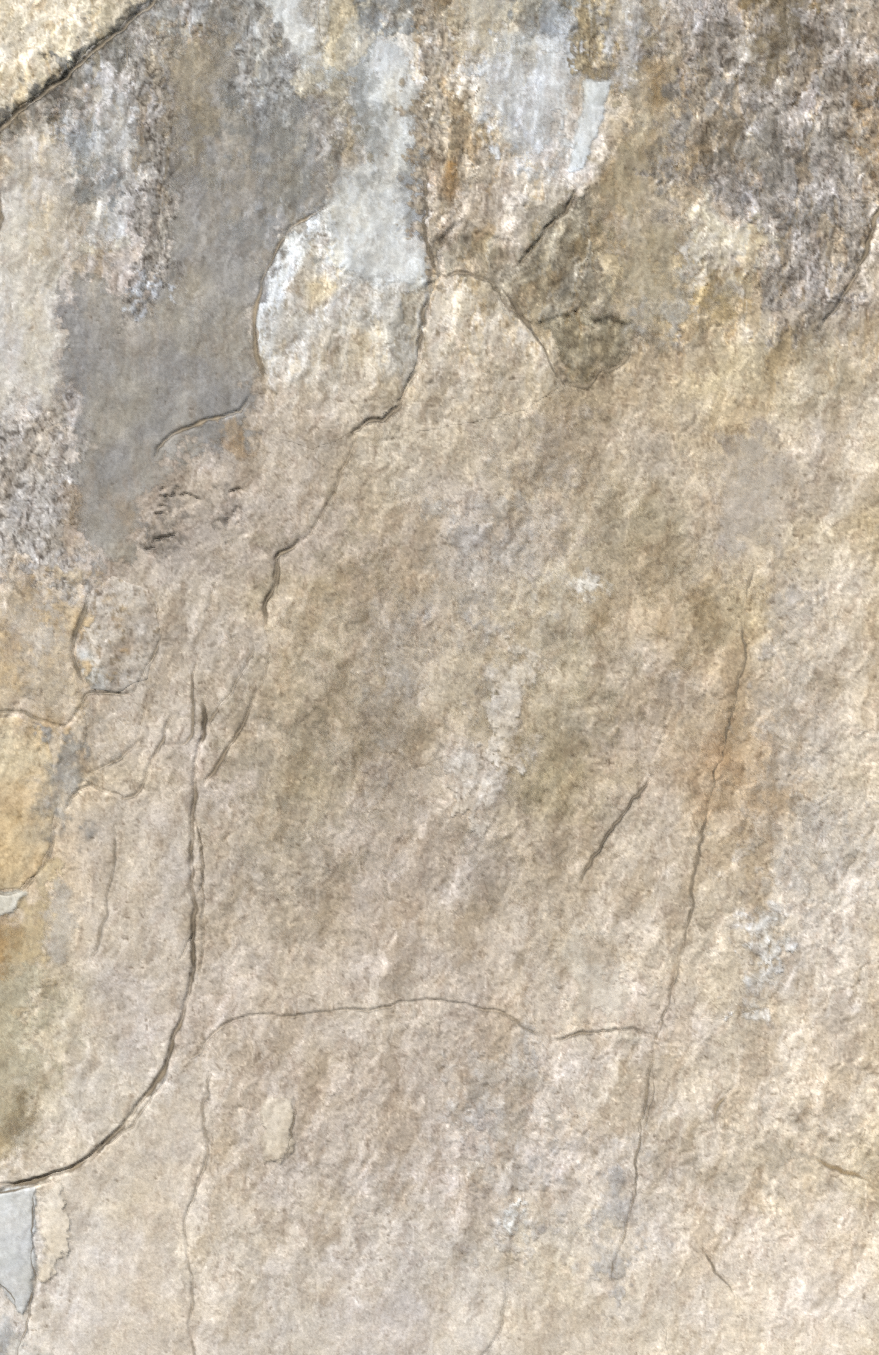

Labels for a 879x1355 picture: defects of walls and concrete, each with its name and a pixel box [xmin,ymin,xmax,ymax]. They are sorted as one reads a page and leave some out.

crack [252,212,317,368]
crack [158,411,241,448]
crack [262,546,295,617]
crack [725,630,746,739]
crack [684,779,715,938]
crack [0,680,248,1337]
crack [566,1030,593,1038]
crack [623,1067,650,1238]